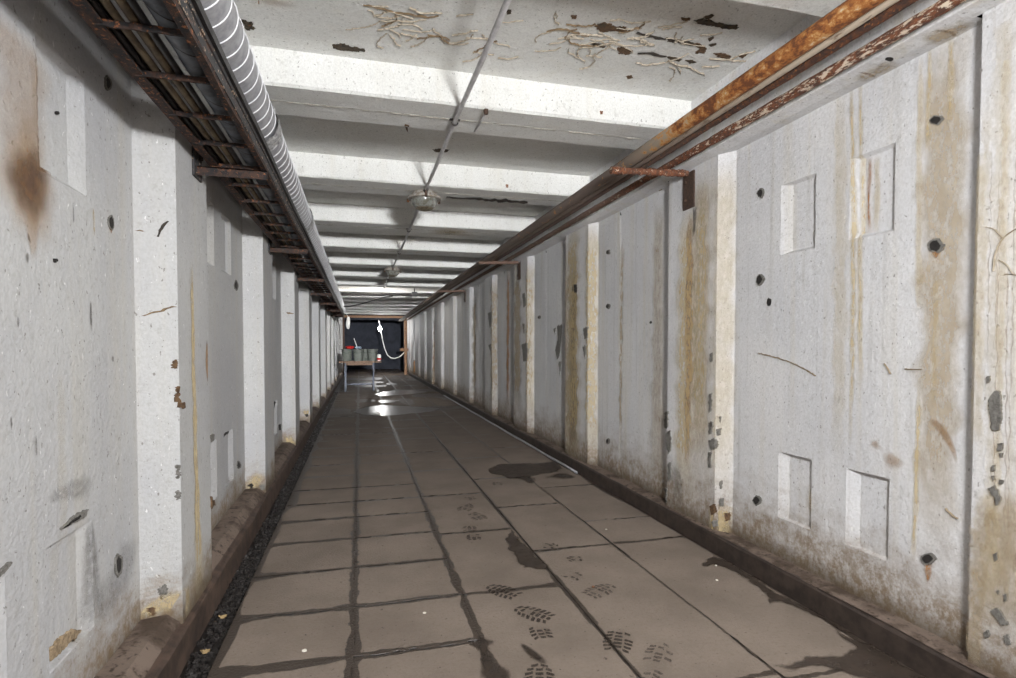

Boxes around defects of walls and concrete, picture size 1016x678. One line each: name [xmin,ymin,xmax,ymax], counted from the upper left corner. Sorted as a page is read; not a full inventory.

crack [346,4,756,82]
rust [13,144,43,210]
peeling [174,386,186,409]
peeling [986,376,1003,431]
peeling [174,465,182,500]
peeling [987,443,1004,506]